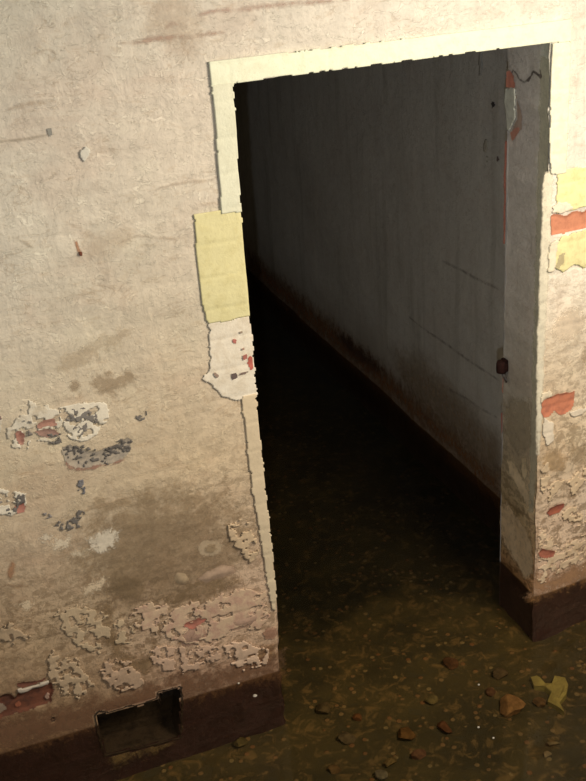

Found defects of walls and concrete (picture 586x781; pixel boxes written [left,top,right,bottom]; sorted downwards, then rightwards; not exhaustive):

peeling [193,210,258,401]
peeling [500,58,586,584]
damp [248,253,501,498]
spalling [0,400,133,494]
spalling [0,488,27,516]
peeling [38,510,122,563]
peeling [198,519,259,563]
peeling [0,575,278,719]
spalling [94,686,184,763]